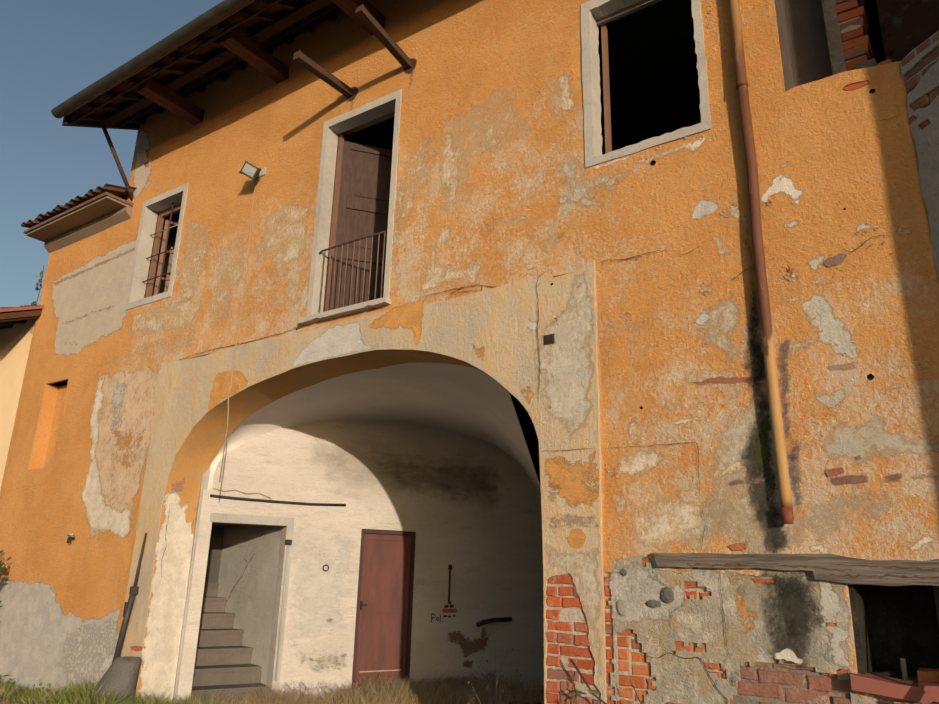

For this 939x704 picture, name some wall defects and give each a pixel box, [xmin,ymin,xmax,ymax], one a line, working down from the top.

peeling [292,227,481,367]
crack [420,284,497,298]
peeling [527,271,595,437]
crack [602,247,698,262]
leakage [742,289,787,553]
leakage [779,340,802,504]
peeling [0,578,120,694]
peeling [130,479,196,704]
crack [648,653,728,704]
crack [719,571,730,657]
flaking render [544,401,939,704]
leakage [762,573,823,668]